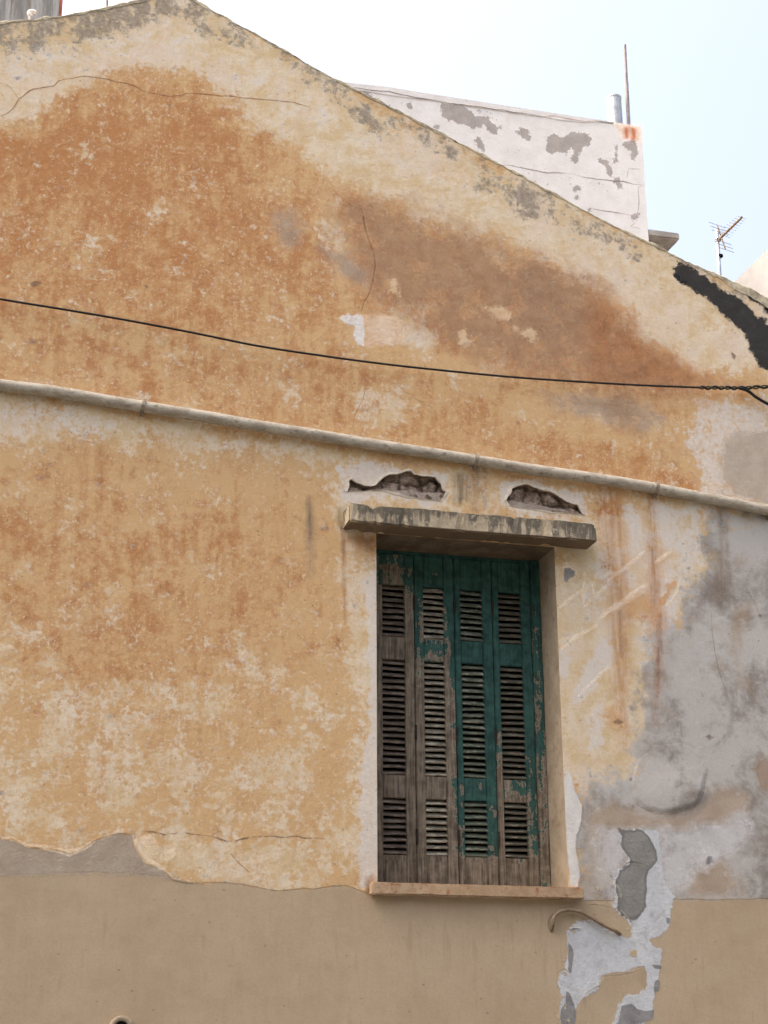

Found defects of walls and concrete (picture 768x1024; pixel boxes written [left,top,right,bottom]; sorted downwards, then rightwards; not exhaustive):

crack [1,76,310,116]
peeling [433,103,502,153]
peeling [546,131,592,164]
rust [618,125,640,141]
crack [341,196,381,310]
damp [317,196,715,433]
spalling [345,468,449,502]
spalling [503,483,585,515]
peeling [0,831,203,885]
crack [145,831,323,873]
peeling [564,770,584,887]
peeling [557,811,753,1024]